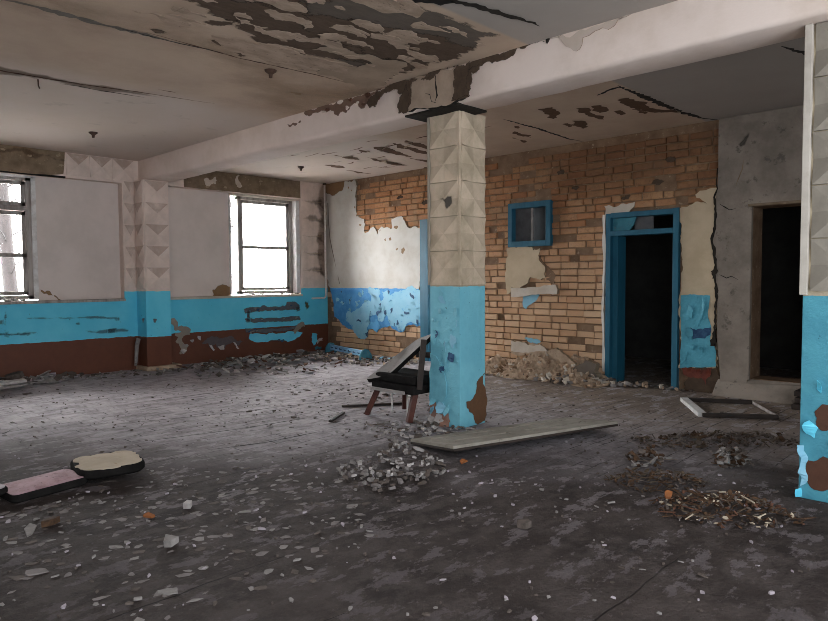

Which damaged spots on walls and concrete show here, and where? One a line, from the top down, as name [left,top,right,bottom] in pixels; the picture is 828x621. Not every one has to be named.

peeling [134,0,631,127]
flaking render [184,171,300,198]
flaking render [306,136,427,241]
flaking render [485,129,719,374]
crack [710,168,738,368]
peeling [171,317,305,354]
peeling [327,286,420,357]
peeling [427,289,459,427]
flaking render [466,373,487,424]
peeling [680,294,720,393]
flaking render [802,404,828,438]
flaking render [795,445,828,497]